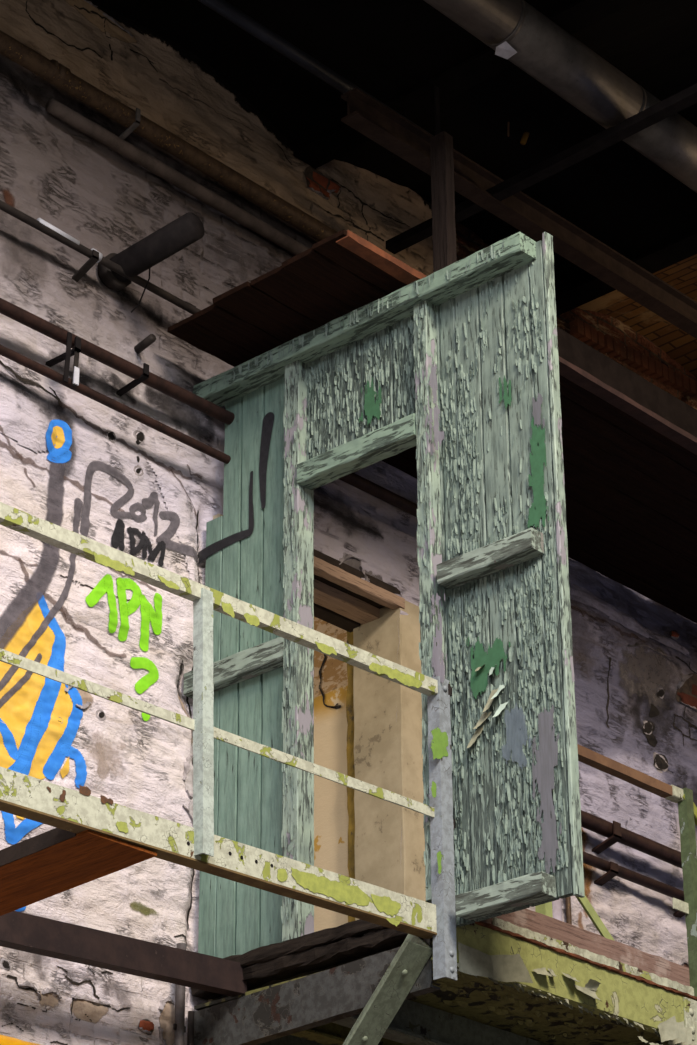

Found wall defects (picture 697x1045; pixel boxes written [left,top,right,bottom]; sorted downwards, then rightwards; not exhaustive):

flaking render [65,0,138,43]
crack [25,1,254,131]
crack [318,178,410,241]
peeling [465,240,504,272]
peeling [208,267,451,393]
peeling [221,601,260,626]
peeling [277,260,568,927]
flaking render [642,673,697,773]
flaking render [20,980,111,1023]
crack [2,966,130,1031]
flaking render [138,996,175,1045]
peeling [433,942,692,1045]